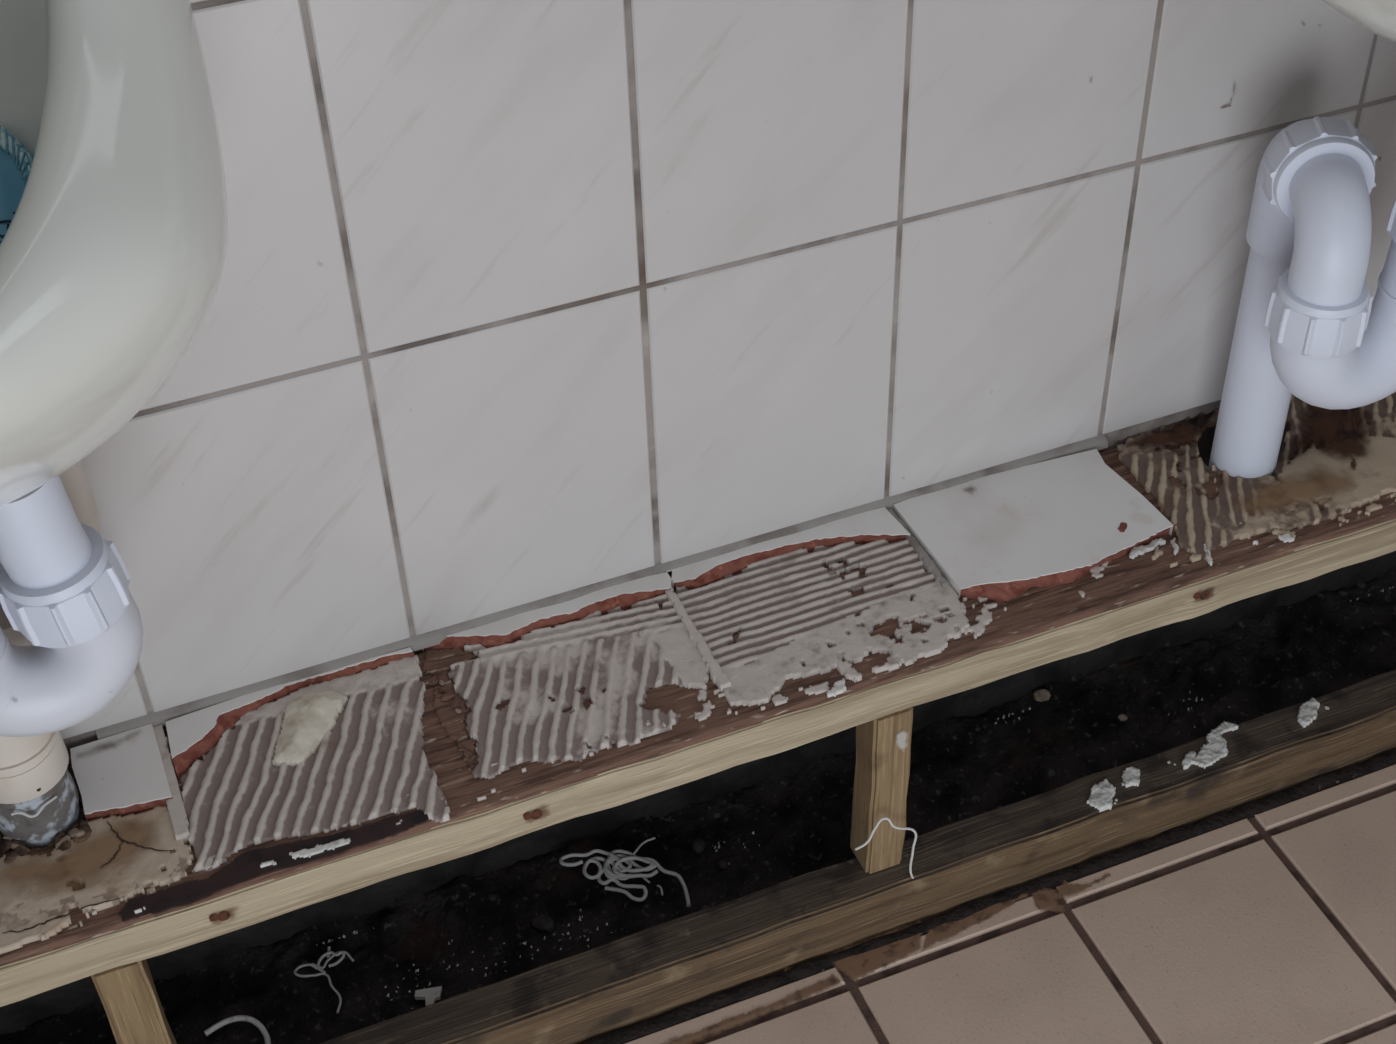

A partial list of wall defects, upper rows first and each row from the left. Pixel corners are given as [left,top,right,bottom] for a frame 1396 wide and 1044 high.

spalling [1197,425,1216,466]
leakage [1247,405,1372,513]
peeling [1252,510,1296,545]
peeling [1337,491,1396,527]
spalling [55,449,1213,851]
spalling [912,551,1396,733]
spalling [0,834,31,863]
leakage [3,824,149,888]
crack [3,821,175,933]
spalling [146,726,856,981]
spalling [0,976,100,1034]